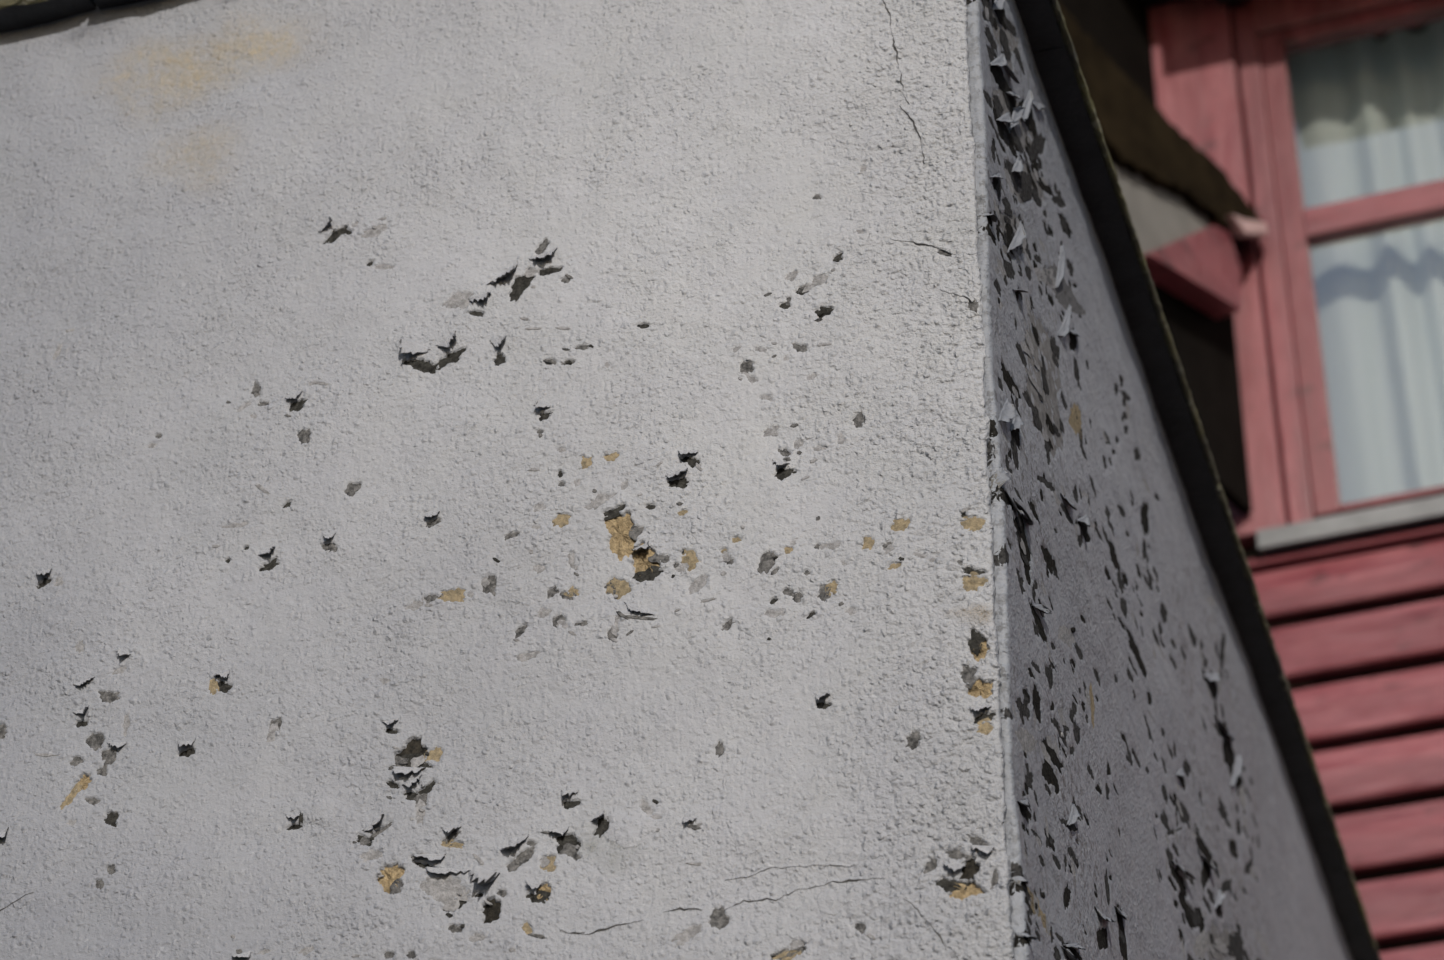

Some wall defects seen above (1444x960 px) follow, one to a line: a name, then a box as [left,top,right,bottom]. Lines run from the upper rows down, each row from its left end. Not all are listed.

crack [883,0,929,164]
peeling [442,238,573,330]
peeling [398,330,466,374]
peeling [763,423,845,481]
peeling [923,0,1269,960]
peeling [405,558,500,611]
peeling [513,552,588,662]
spalling [505,450,745,642]
peeling [757,540,797,575]
peeling [764,542,857,619]
peeling [36,676,130,827]
peeling [353,718,609,943]